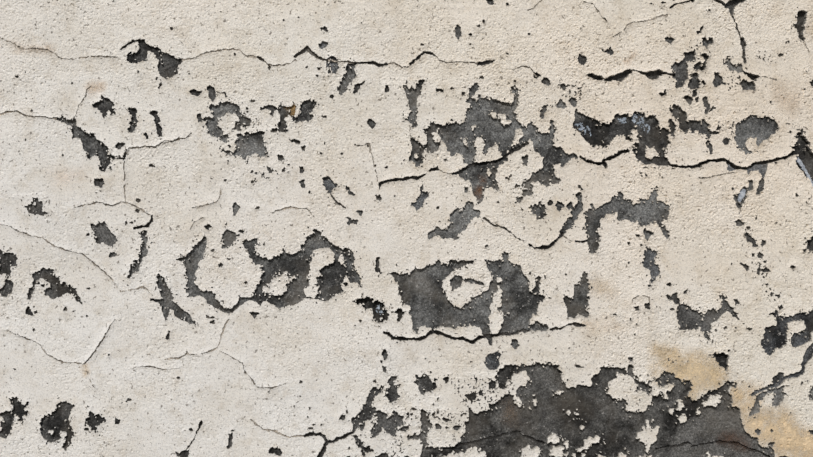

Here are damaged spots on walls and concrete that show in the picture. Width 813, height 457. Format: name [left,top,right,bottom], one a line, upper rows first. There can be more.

peeling [120,34,183,88]
crack [583,0,777,82]
peeling [189,26,365,182]
peeling [53,114,129,198]
crack [354,141,529,189]
crack [579,149,630,169]
peeling [400,25,813,356]
crack [669,149,799,179]
peeling [0,244,86,316]
peeling [123,202,793,457]
crack [383,322,587,344]
peeling [36,397,120,451]